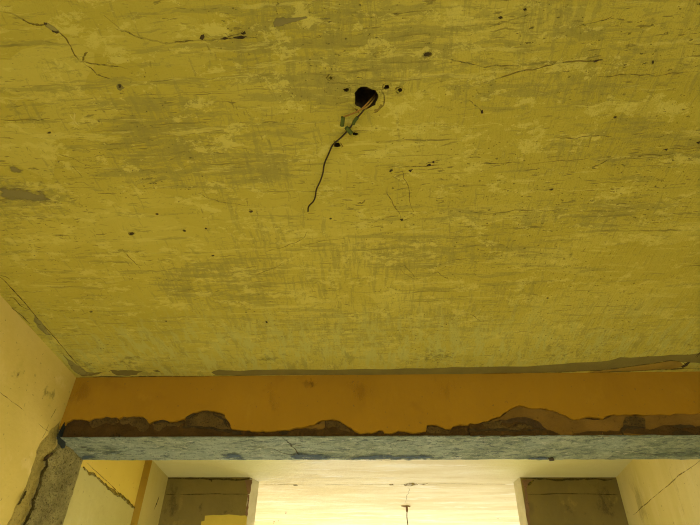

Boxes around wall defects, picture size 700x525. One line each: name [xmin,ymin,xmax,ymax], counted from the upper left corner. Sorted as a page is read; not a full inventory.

crack [23,19,118,79]
crack [451,59,602,83]
crack [0,275,74,360]
peeling [212,353,700,376]
spalling [7,406,700,525]